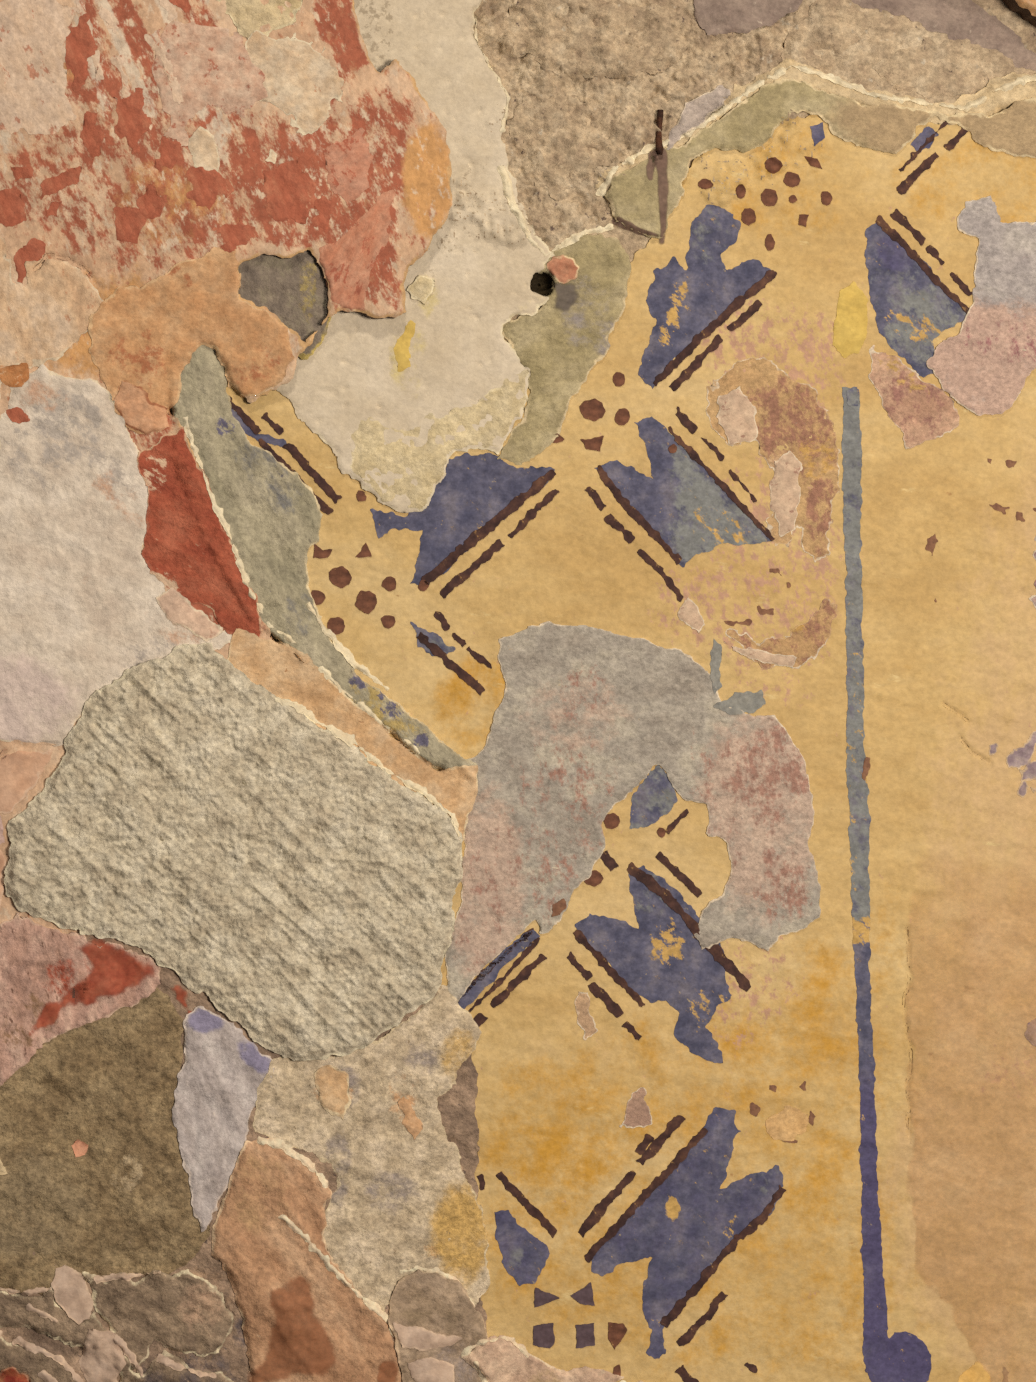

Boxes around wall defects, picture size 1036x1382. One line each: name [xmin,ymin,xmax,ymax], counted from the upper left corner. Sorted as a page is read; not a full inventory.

peeling [473,0,1036,465]
peeling [925,534,938,556]
peeling [989,503,1036,522]
peeling [0,0,821,1382]
peeling [862,757,871,781]
peeling [989,731,1036,797]